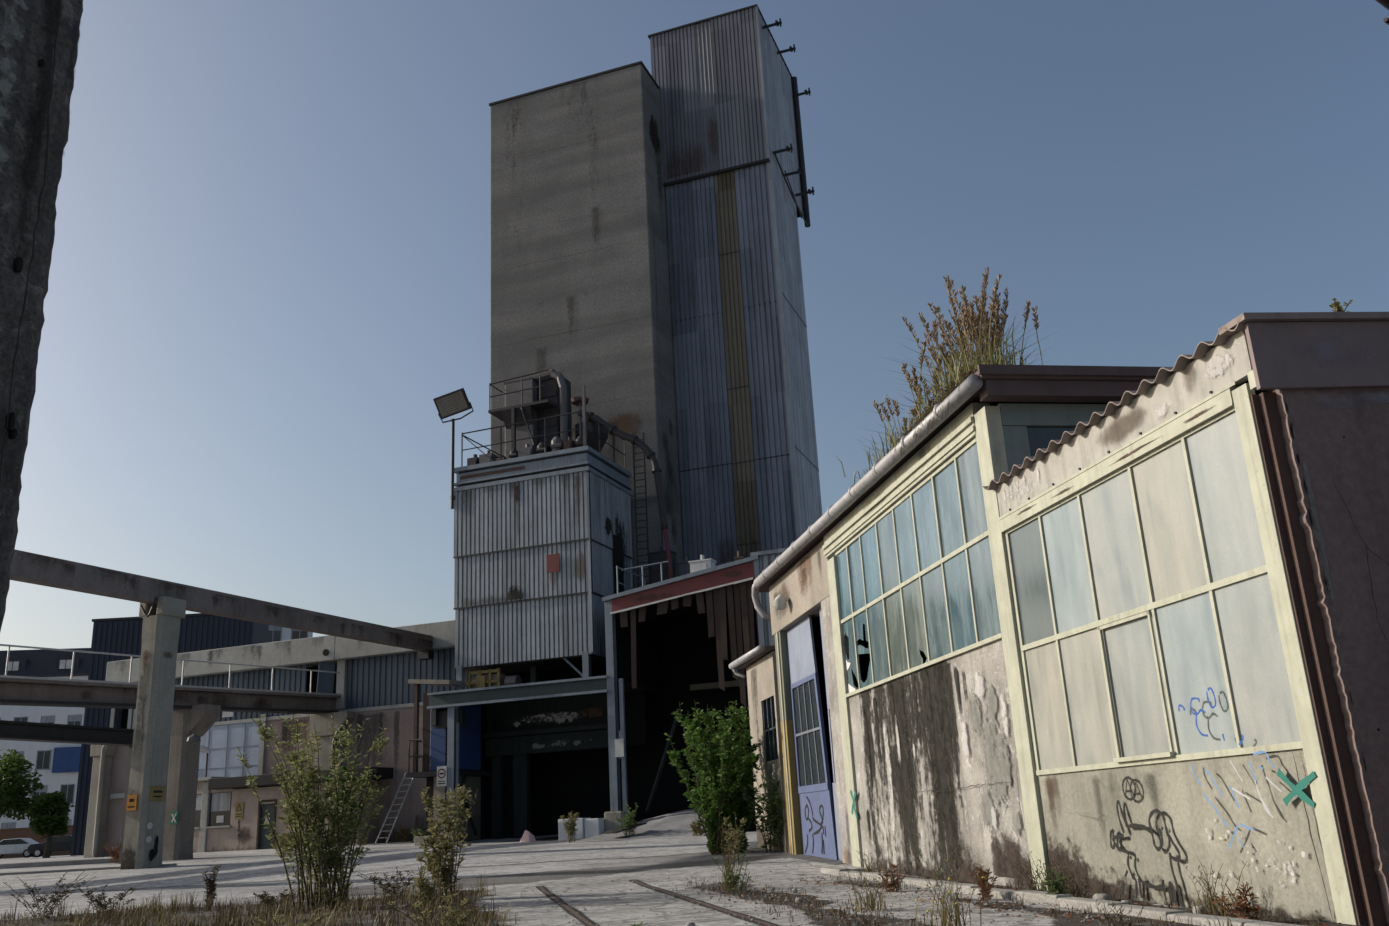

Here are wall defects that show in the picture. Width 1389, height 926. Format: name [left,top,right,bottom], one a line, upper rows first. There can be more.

water stain [0,0,28,127]
water stain [18,0,81,257]
water stain [859,660,1034,888]
peeling [960,671,1021,836]
water stain [1046,778,1057,809]
water stain [1047,837,1208,909]
water stain [1205,819,1305,886]
water stain [1234,893,1328,922]